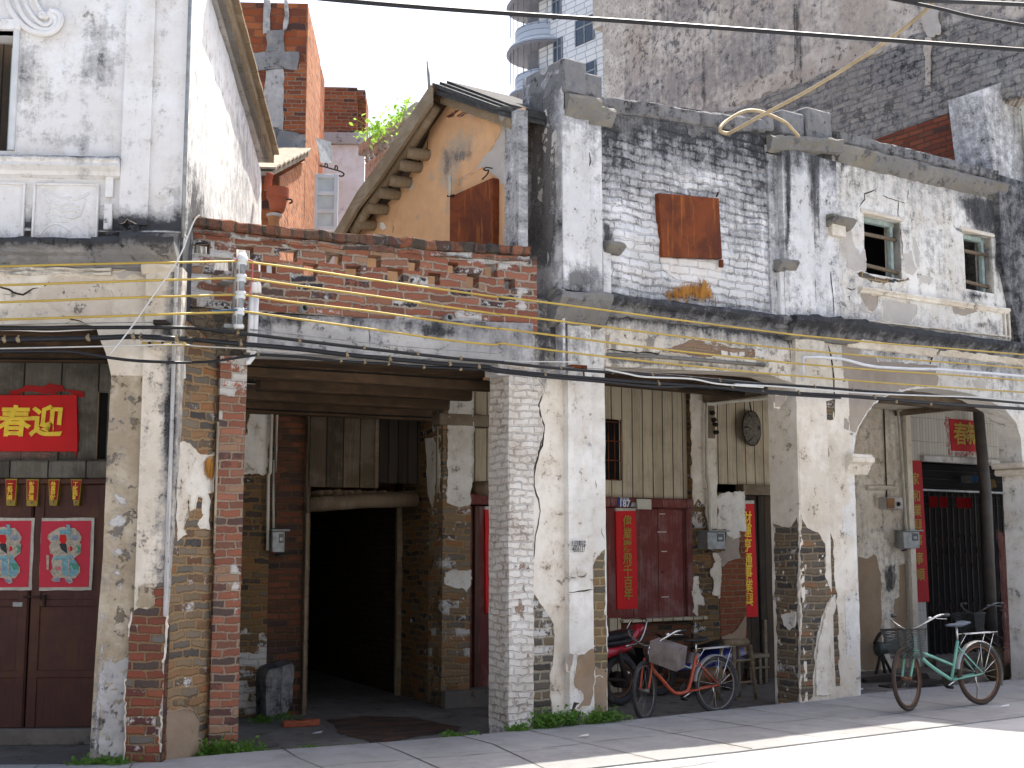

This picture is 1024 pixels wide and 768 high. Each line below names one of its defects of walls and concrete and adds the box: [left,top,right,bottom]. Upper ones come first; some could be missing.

corrosion [665,280,716,307]
flaking render [839,230,934,324]
flaking render [95,581,190,763]
flaking render [176,452,216,535]
crack [533,377,546,556]
flaking render [533,550,608,729]
flaking render [692,506,747,613]
flaking render [773,515,841,703]